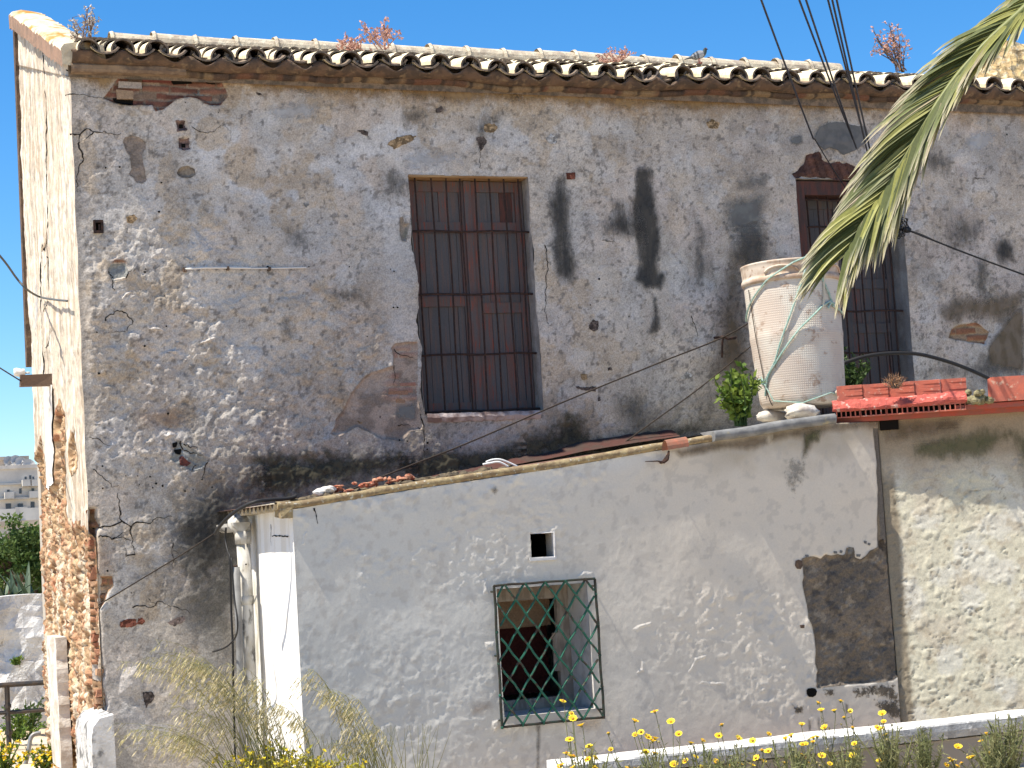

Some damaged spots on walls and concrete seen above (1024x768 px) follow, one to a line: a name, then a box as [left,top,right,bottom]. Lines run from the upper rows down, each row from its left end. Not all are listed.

flaking render [104,79,228,111]
flaking render [123,135,147,183]
crack [40,52,121,373]
water stain [551,179,574,279]
water stain [607,168,664,333]
flaking render [949,323,989,344]
flaking render [330,342,422,441]
flaking render [170,440,208,480]
flaking render [34,385,113,768]
crack [85,469,172,557]
water stain [185,493,232,561]
flaking render [795,428,897,697]